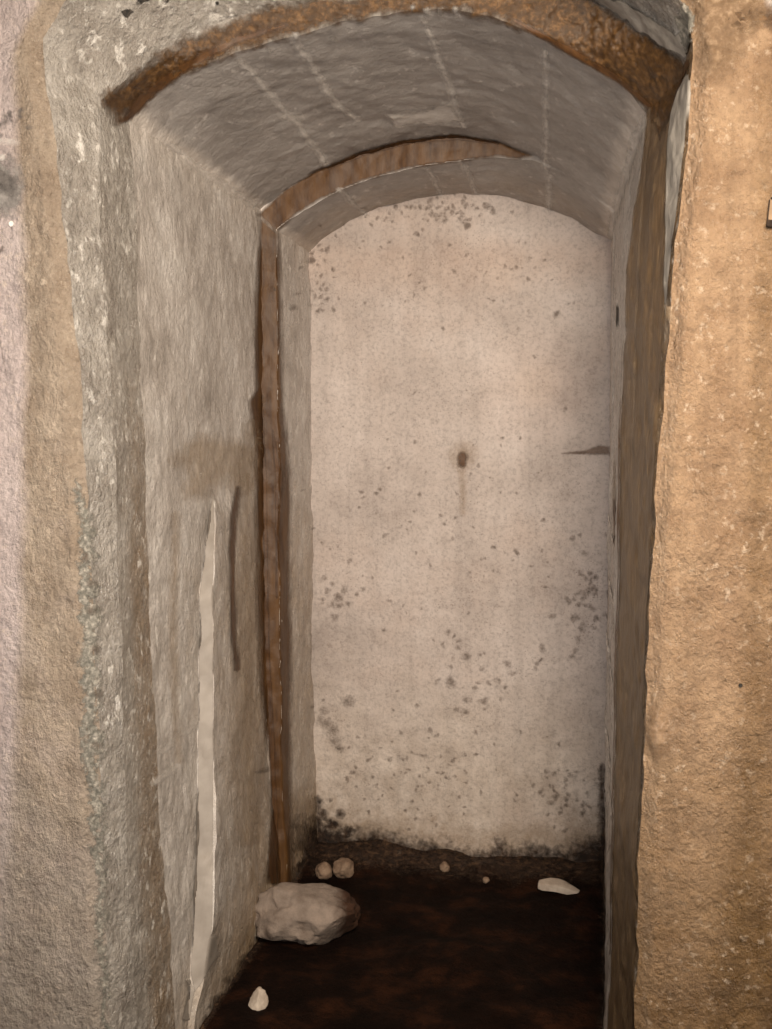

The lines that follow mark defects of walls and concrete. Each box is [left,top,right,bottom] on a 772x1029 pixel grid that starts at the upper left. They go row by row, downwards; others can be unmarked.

damp [104,0,684,1029]